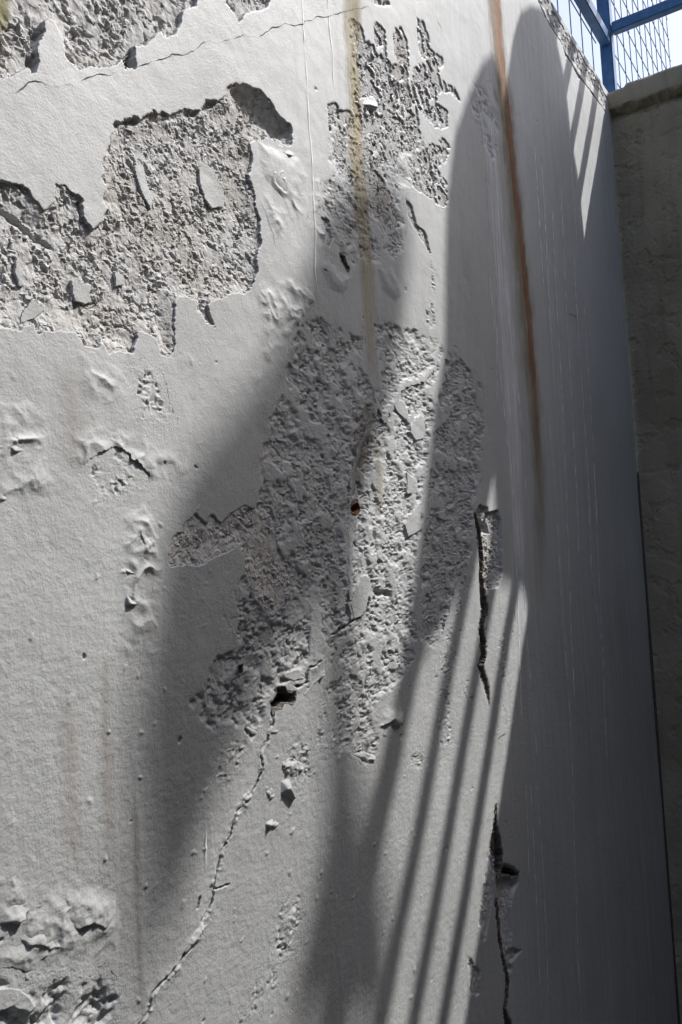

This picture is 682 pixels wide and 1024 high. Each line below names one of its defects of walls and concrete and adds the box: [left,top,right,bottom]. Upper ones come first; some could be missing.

spalling [0,0,194,78]
crack [138,6,366,67]
crack [4,73,110,95]
spalling [0,85,294,444]
rust [490,0,541,490]
spalling [167,21,512,798]
crack [473,511,491,705]
peeling [0,903,63,950]
peeling [54,886,116,930]
crack [491,803,519,1024]
spalling [0,963,123,1024]